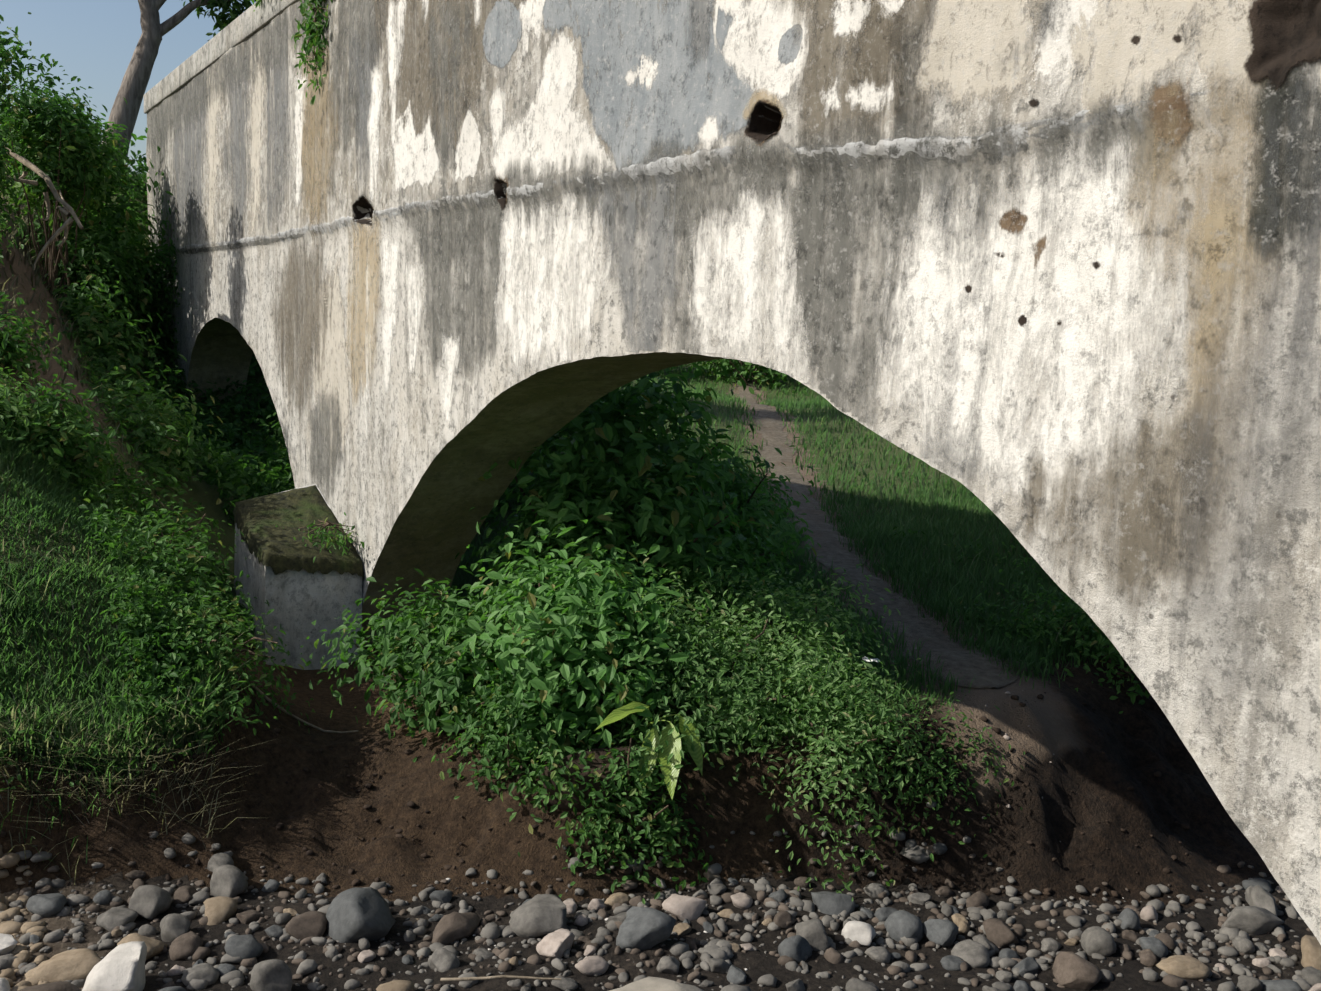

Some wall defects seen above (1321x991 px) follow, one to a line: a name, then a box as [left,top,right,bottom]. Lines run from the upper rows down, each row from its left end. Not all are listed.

damp [149,0,1014,422]
peeling [365,0,809,383]
peeling [820,80,894,116]
peeling [831,0,904,36]
damp [1030,0,1110,97]
damp [1037,84,1174,216]
rust [1142,79,1193,197]
peeling [1070,0,1321,116]
damp [274,239,345,496]
peeling [442,337,459,427]
damp [945,330,982,471]
rust [1022,102,1257,600]